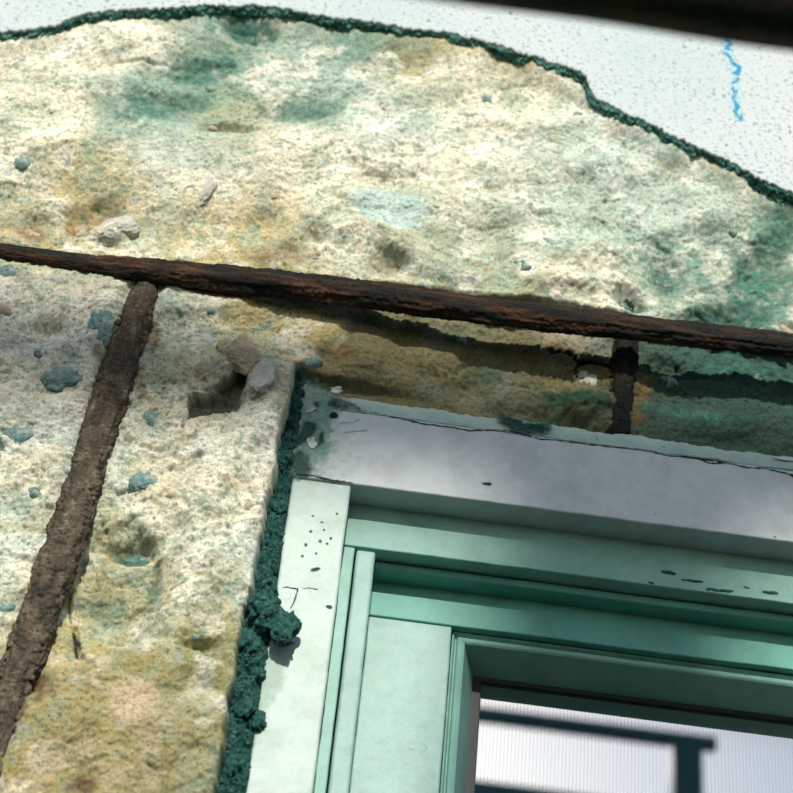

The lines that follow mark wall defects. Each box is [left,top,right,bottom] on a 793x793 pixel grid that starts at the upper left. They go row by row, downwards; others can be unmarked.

spalling [0,5,793,333]
spalling [0,257,136,665]
rust [0,230,793,778]
spalling [41,285,793,793]